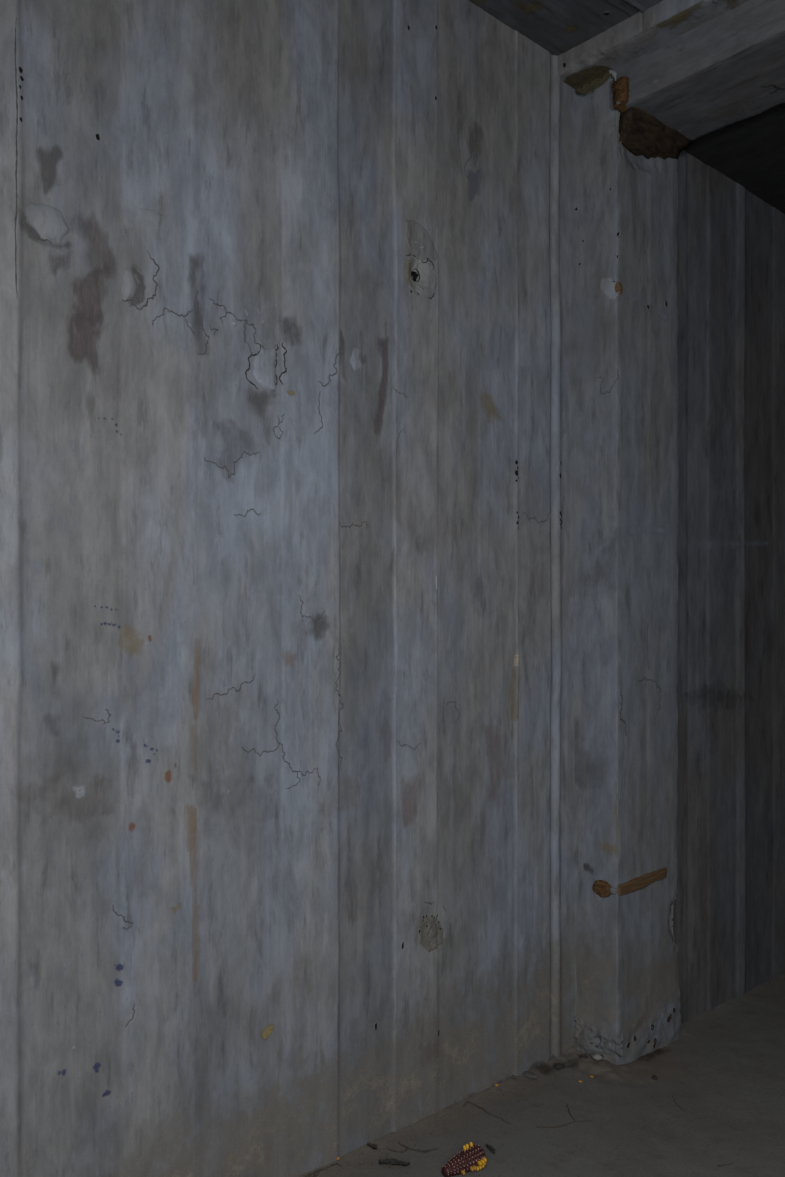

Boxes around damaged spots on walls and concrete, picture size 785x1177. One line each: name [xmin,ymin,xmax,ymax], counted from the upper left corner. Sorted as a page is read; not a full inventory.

water stain [39,147,61,190]
crack [152,290,276,355]
crack [210,675,255,700]
crack [243,648,344,789]